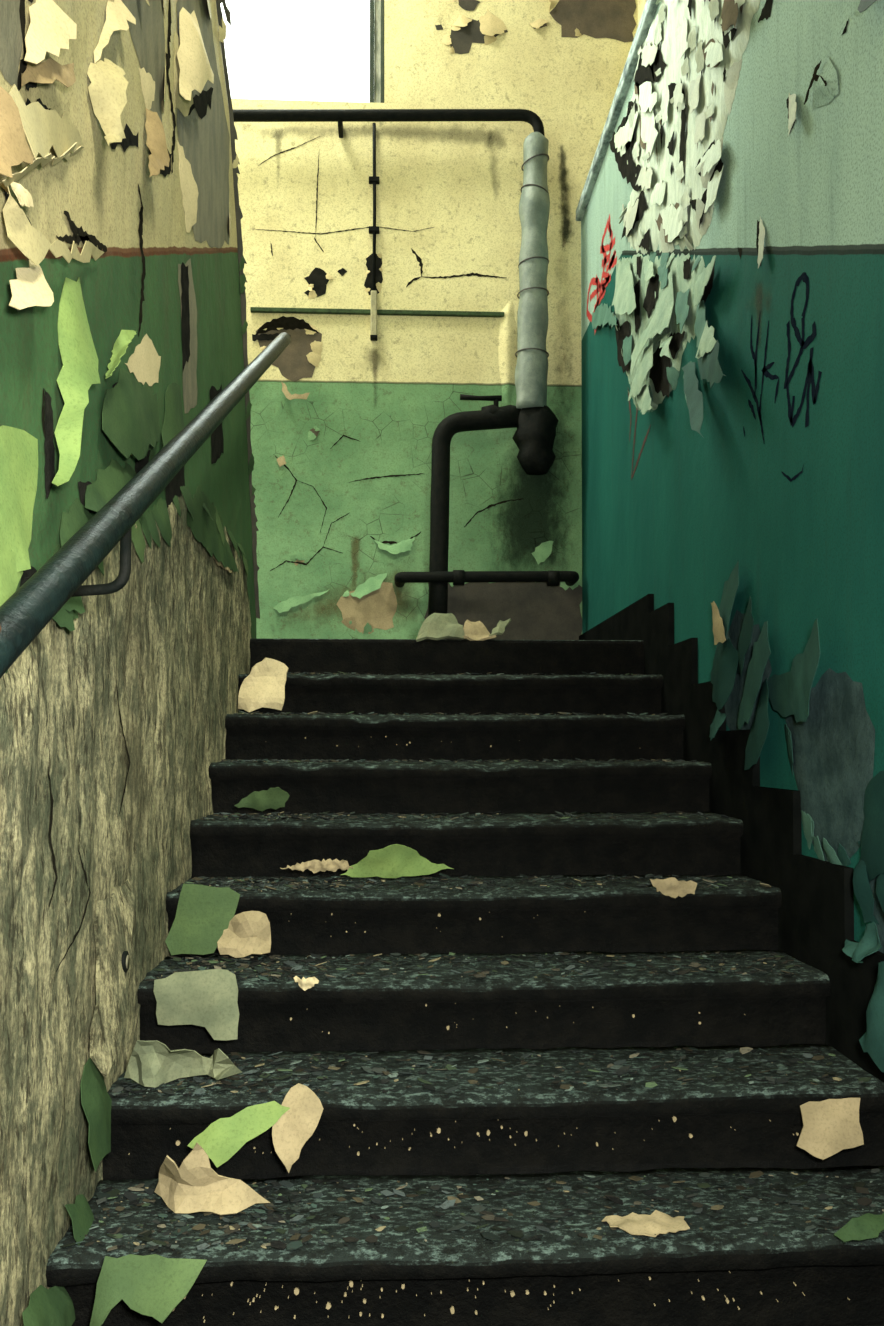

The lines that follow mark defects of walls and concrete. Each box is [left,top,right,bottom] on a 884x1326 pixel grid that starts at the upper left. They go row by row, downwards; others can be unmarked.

peeling [435,0,508,54]
peeling [786,93,797,135]
peeling [0,0,323,606]
spalling [304,267,347,299]
spalling [364,253,383,295]
crack [256,136,507,287]
peeling [529,0,773,437]
crack [270,457,423,571]
peeling [0,391,884,1326]